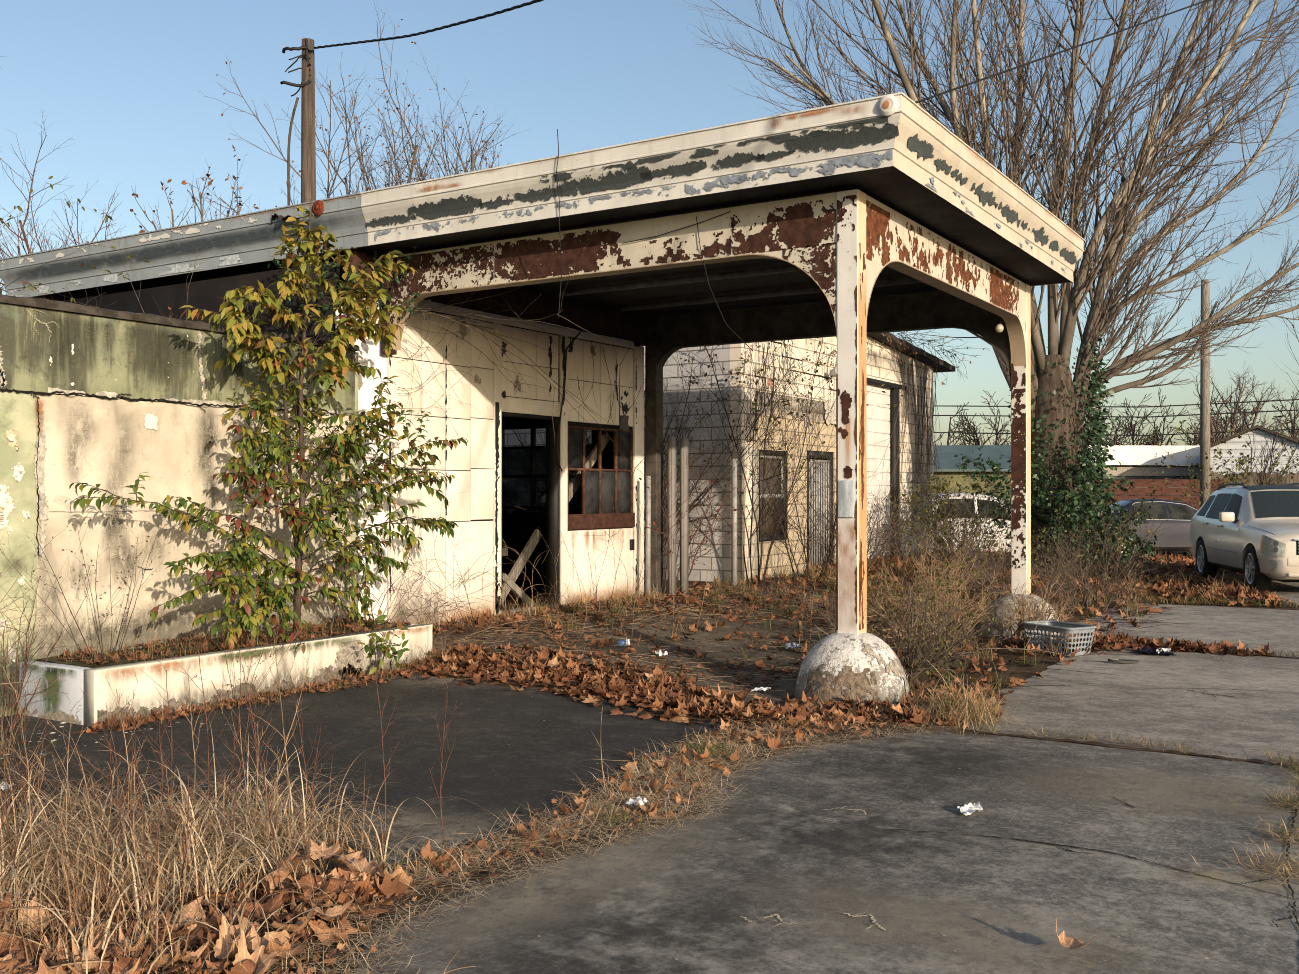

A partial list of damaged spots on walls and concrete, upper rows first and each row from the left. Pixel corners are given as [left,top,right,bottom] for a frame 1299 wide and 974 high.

peeling [365,116,1080,274]
spalling [0,411,49,580]
corrosion [390,195,1019,630]
corrosion [1011,388,1026,569]
crack [839,912,886,931]
crack [826,795,1299,927]